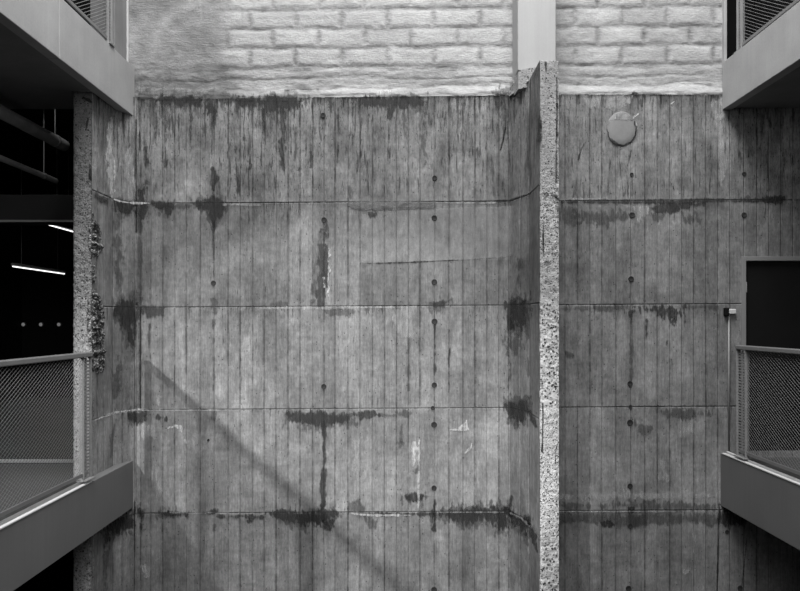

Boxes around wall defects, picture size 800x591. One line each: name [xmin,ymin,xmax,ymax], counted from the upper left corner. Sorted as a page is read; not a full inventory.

leakage [159,93,217,123]
leakage [352,91,429,119]
leakage [234,91,303,171]
leakage [184,167,225,255]
leakage [561,195,785,225]
leakage [311,221,350,315]
leakage [504,278,531,380]
leakage [99,409,187,444]
leakage [503,396,537,428]
leakage [206,410,381,531]
leakage [684,503,747,528]